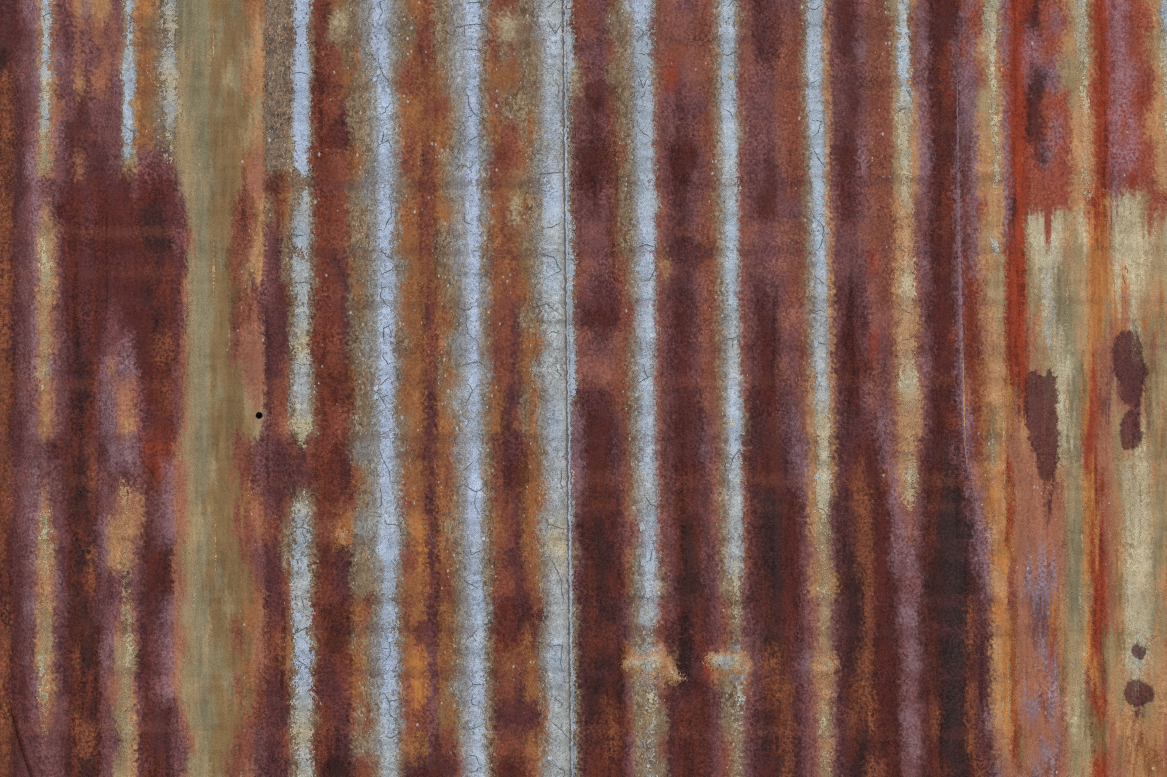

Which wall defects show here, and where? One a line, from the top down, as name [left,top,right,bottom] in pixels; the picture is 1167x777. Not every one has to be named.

rust [58,161,188,777]
rust [224,9,361,777]
crack [367,0,405,145]
crack [375,199,489,549]
crack [450,664,488,773]
crack [452,0,489,52]
rust [485,401,548,777]
crack [532,223,561,335]
crack [544,642,569,738]
rust [575,388,630,777]
rust [917,0,996,777]
rust [1007,0,1060,494]